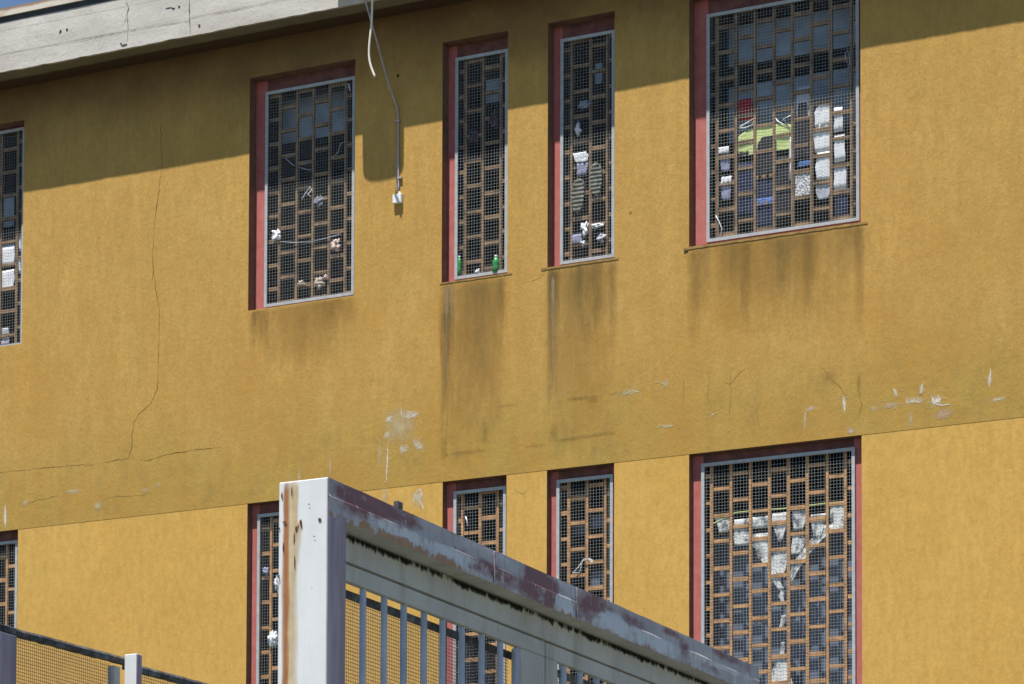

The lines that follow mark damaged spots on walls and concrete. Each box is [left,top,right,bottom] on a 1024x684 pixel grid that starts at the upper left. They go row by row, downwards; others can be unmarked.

crack [0,113,219,473]
peeling [873,384,952,426]
peeling [377,409,424,498]